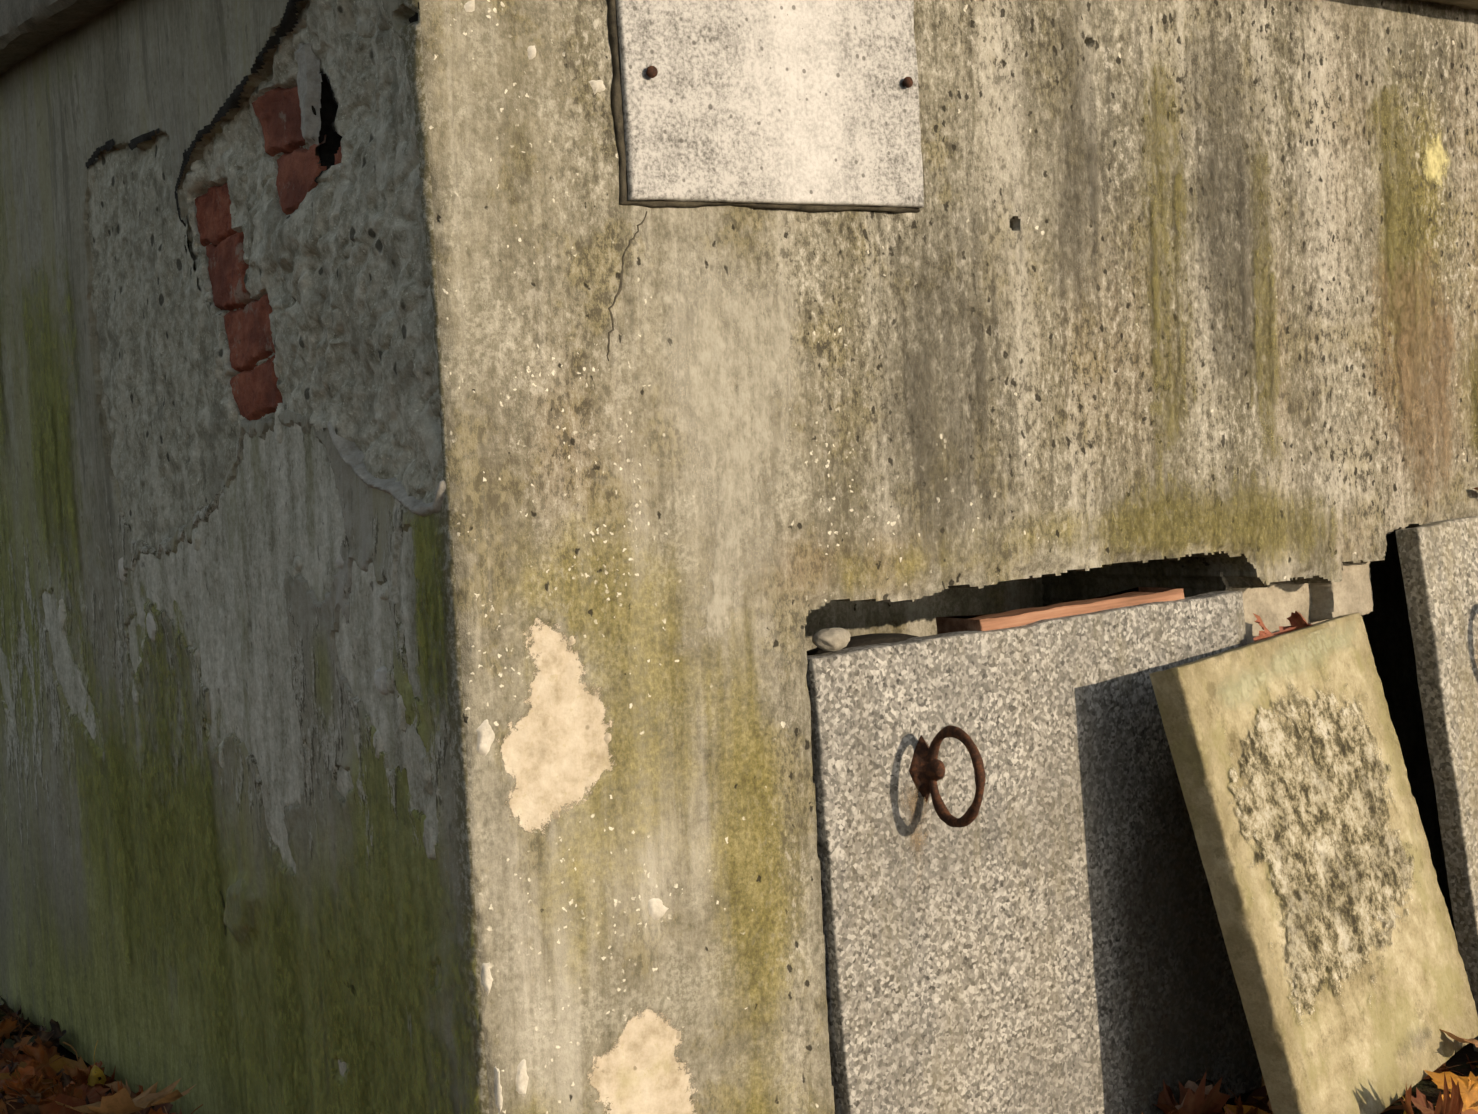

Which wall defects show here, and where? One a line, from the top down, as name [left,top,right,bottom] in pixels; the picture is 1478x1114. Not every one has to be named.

crack [607,211,647,361]
flaking render [85,0,446,874]
peeling [42,591,107,763]
flaking render [476,618,617,835]
flaking render [587,1006,698,1114]